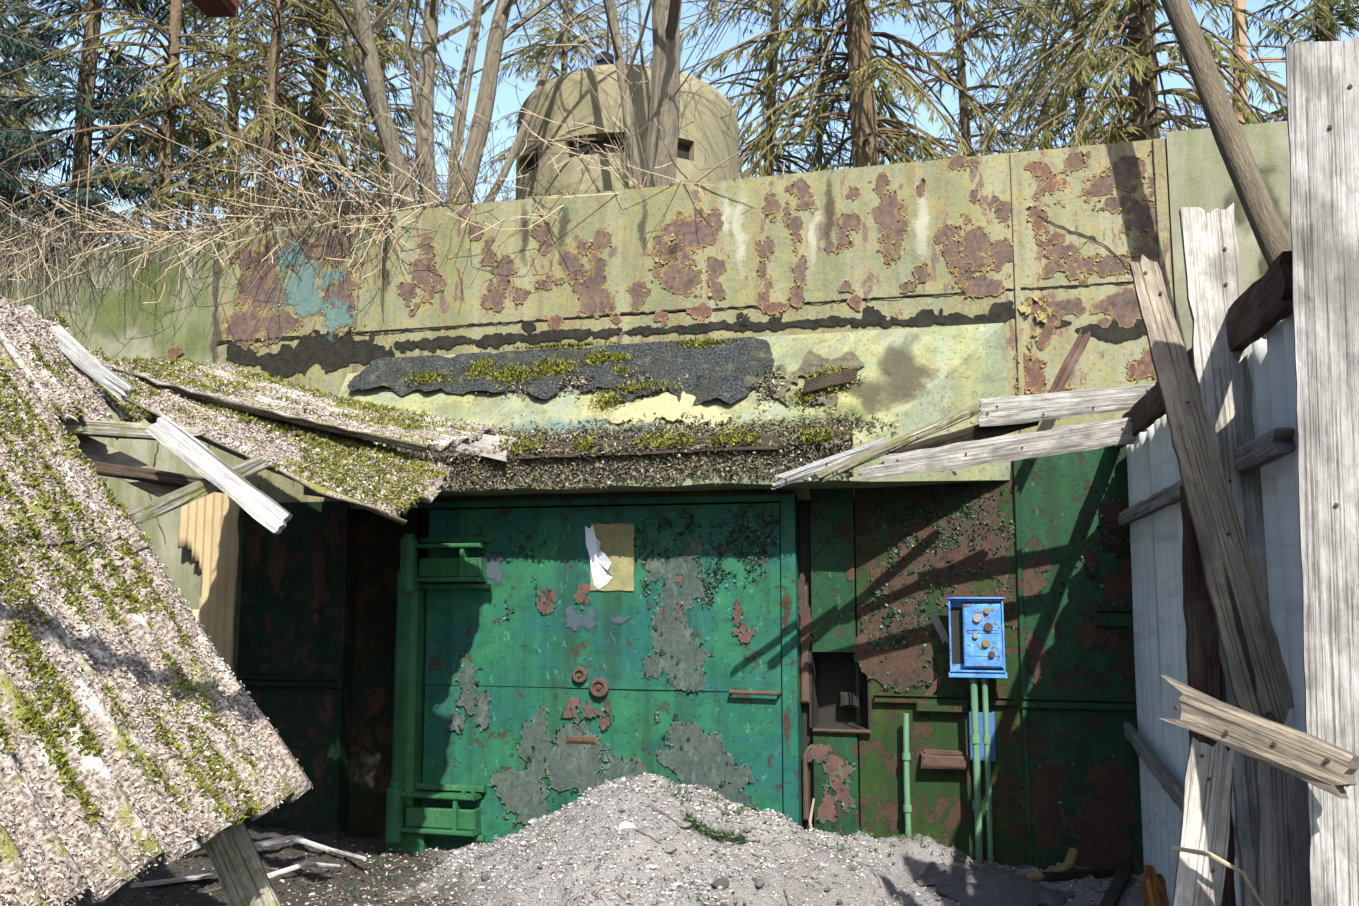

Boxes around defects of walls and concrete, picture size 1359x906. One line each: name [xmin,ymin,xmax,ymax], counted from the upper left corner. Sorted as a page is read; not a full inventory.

rust [223,222,363,352]
crack [216,292,966,345]
rust [467,206,729,326]
rust [755,176,821,317]
rust [824,170,927,265]
rust [933,148,1168,396]
crack [1006,215,1138,290]
peeling [531,575,557,625]
peeling [574,579,592,610]
peeling [633,502,780,692]
peeling [445,653,492,733]
peeling [488,697,760,826]